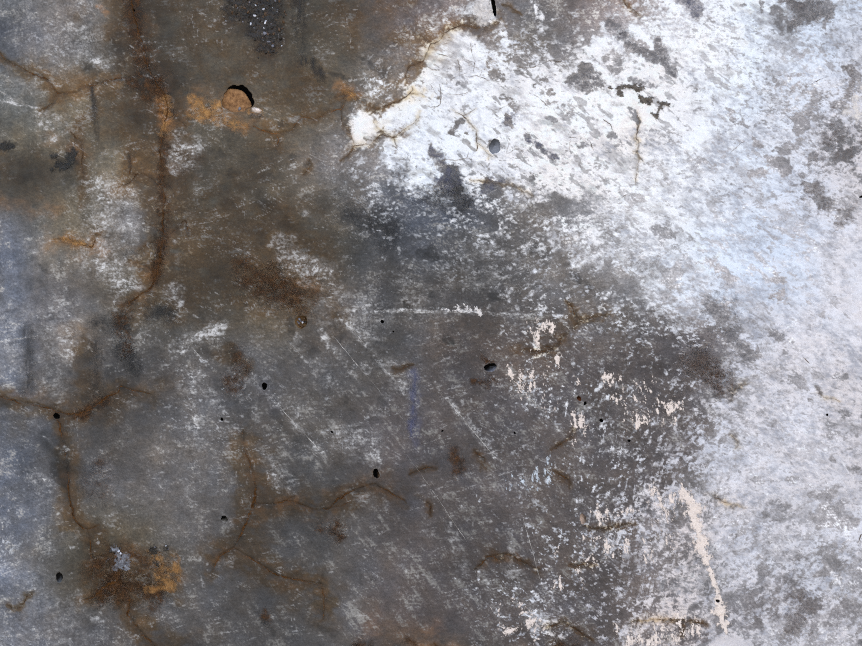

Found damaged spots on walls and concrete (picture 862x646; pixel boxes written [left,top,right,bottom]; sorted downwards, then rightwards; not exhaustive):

crack [118,2,188,308]
crack [321,93,417,156]
crack [388,24,495,183]
crack [67,480,91,550]
crack [214,431,256,566]